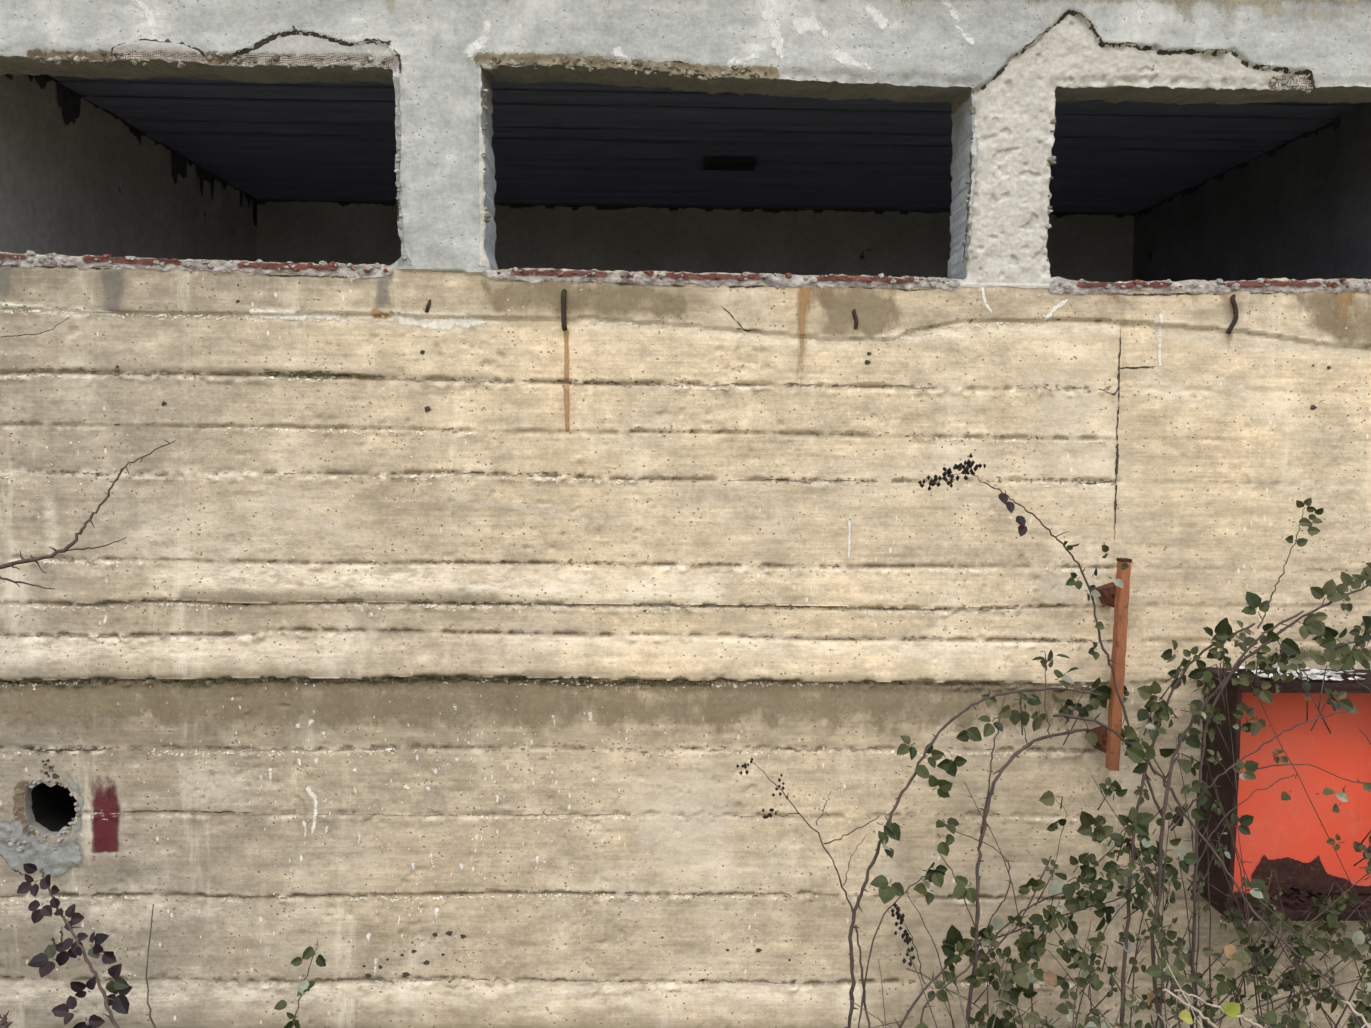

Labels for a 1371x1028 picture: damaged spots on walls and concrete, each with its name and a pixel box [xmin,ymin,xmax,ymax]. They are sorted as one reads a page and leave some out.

flaking render [27,32,412,313]
flaking render [737,12,1315,288]
peeling [14,250,67,264]
leakage [378,278,683,330]
corrosion [798,274,912,352]
peeling [1133,279,1198,290]
leakage [1300,292,1371,345]
spalling [0,745,151,853]